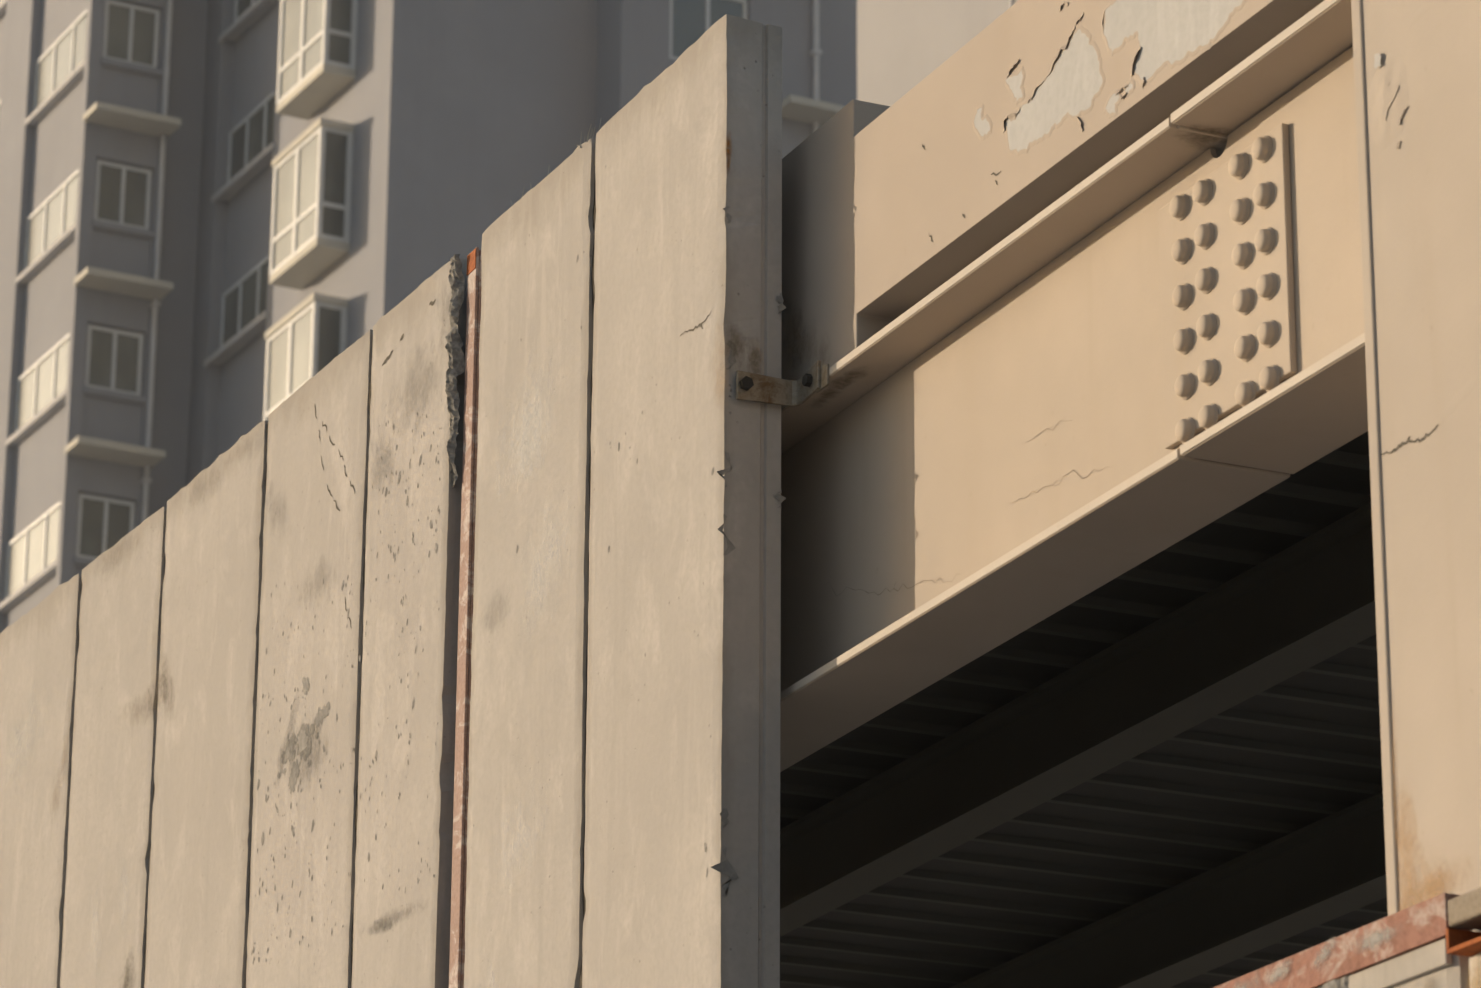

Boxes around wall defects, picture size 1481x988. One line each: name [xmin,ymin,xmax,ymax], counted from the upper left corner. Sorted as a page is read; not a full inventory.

peeling [972,0,1247,157]
crack [680,311,711,336]
crack [314,404,355,511]
spalling [711,452,732,487]
crack [1009,467,1105,503]
crack [1380,425,1438,455]
spalling [718,514,736,556]
spalling [720,808,729,828]
spalling [704,842,739,897]